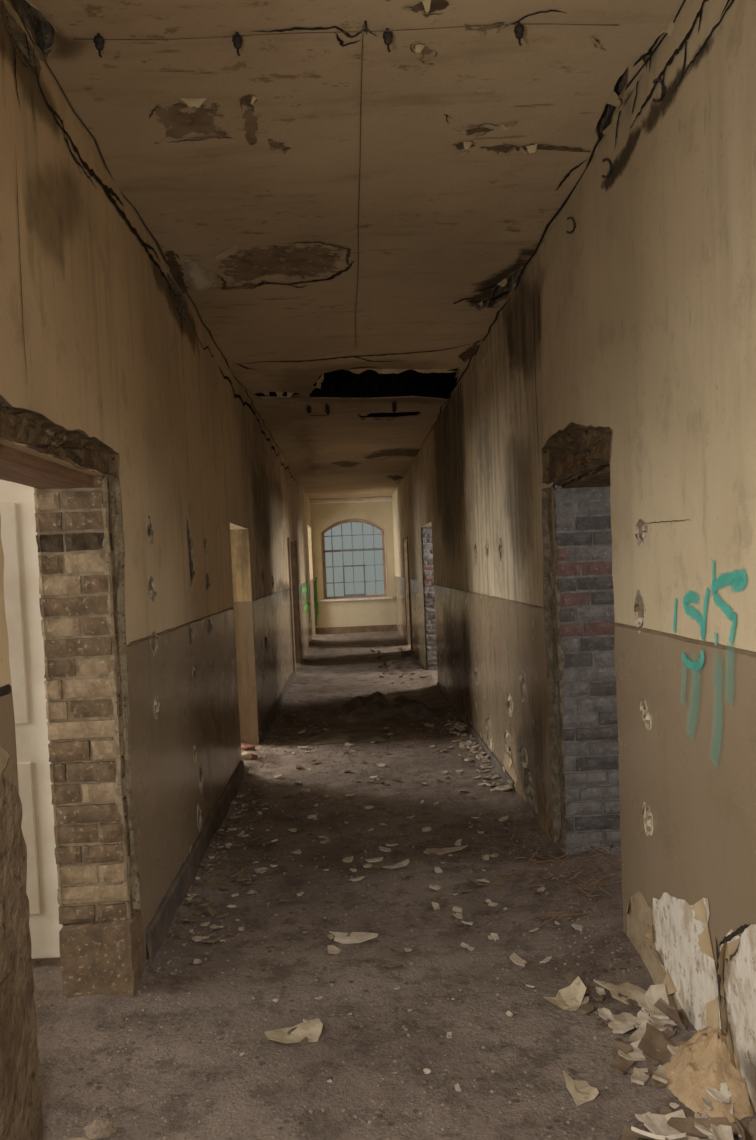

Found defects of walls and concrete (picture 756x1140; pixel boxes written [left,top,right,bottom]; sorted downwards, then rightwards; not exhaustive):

peeling [148,94,291,154]
peeling [211,242,351,290]
crack [10,0,734,485]
peeling [0,745,44,1140]
flaking render [0,395,141,919]
flaking render [486,717,535,808]
flaking render [541,422,613,858]
peeling [627,891,756,1110]